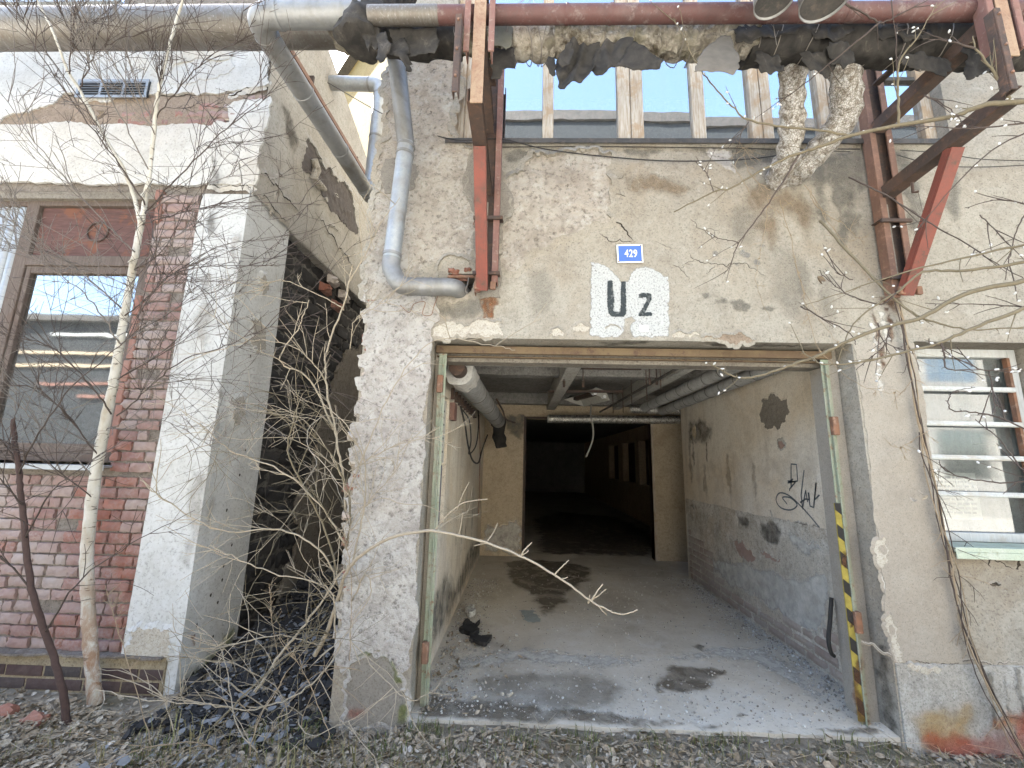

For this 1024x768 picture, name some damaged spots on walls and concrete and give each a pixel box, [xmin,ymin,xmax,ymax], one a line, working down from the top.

flaking render [118,103,235,126]
flaking render [294,58,403,313]
flaking render [400,60,477,305]
damp [718,146,776,168]
damp [751,154,862,245]
flaking render [759,392,791,451]
spalling [341,397,362,546]
damp [432,509,652,637]
damp [657,666,725,692]